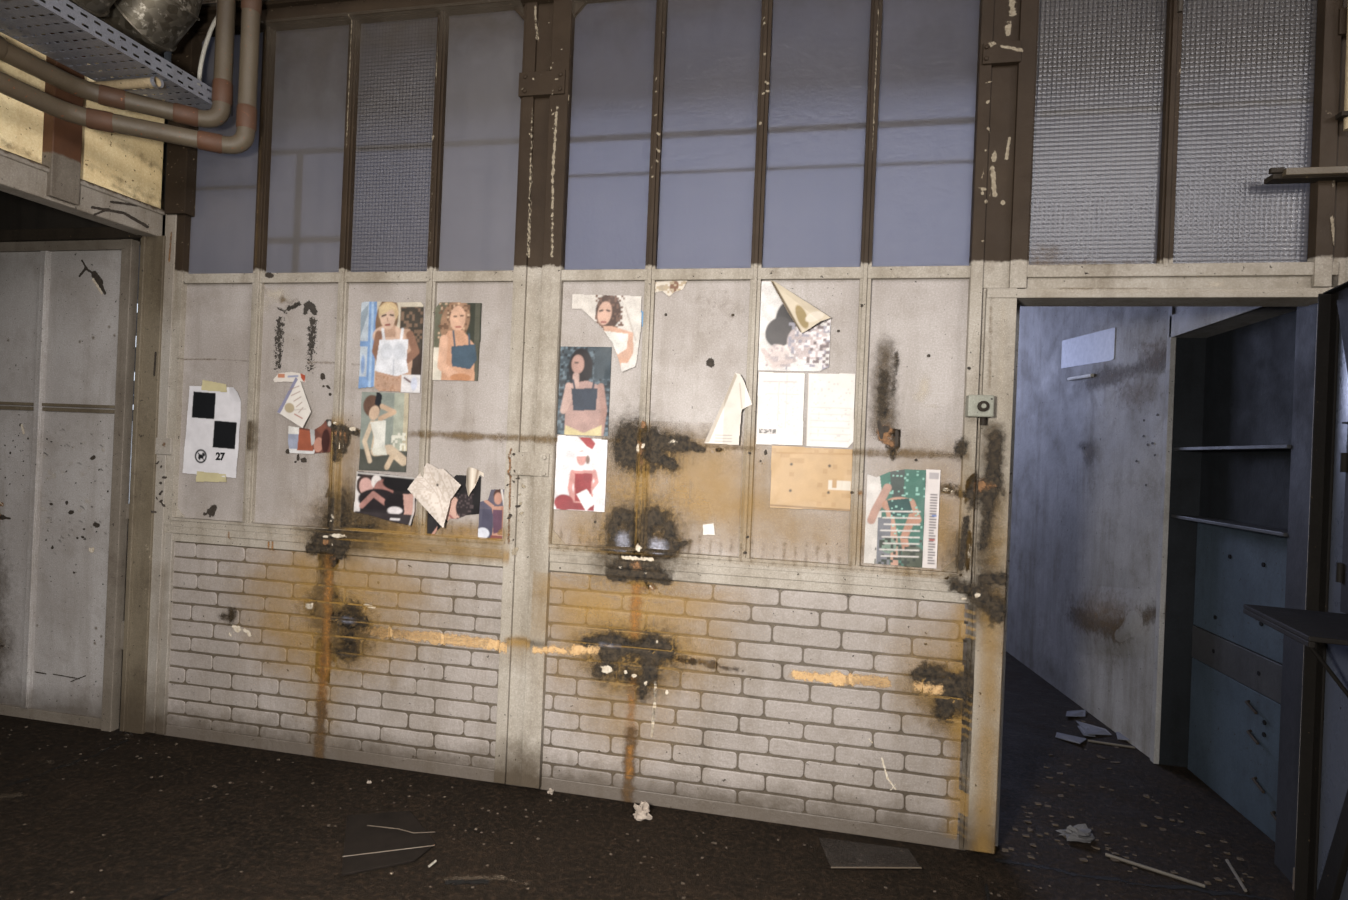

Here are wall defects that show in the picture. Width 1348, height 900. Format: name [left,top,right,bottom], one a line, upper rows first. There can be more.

rust [274,539,378,758]
rust [565,579,697,671]
rust [614,677,636,803]